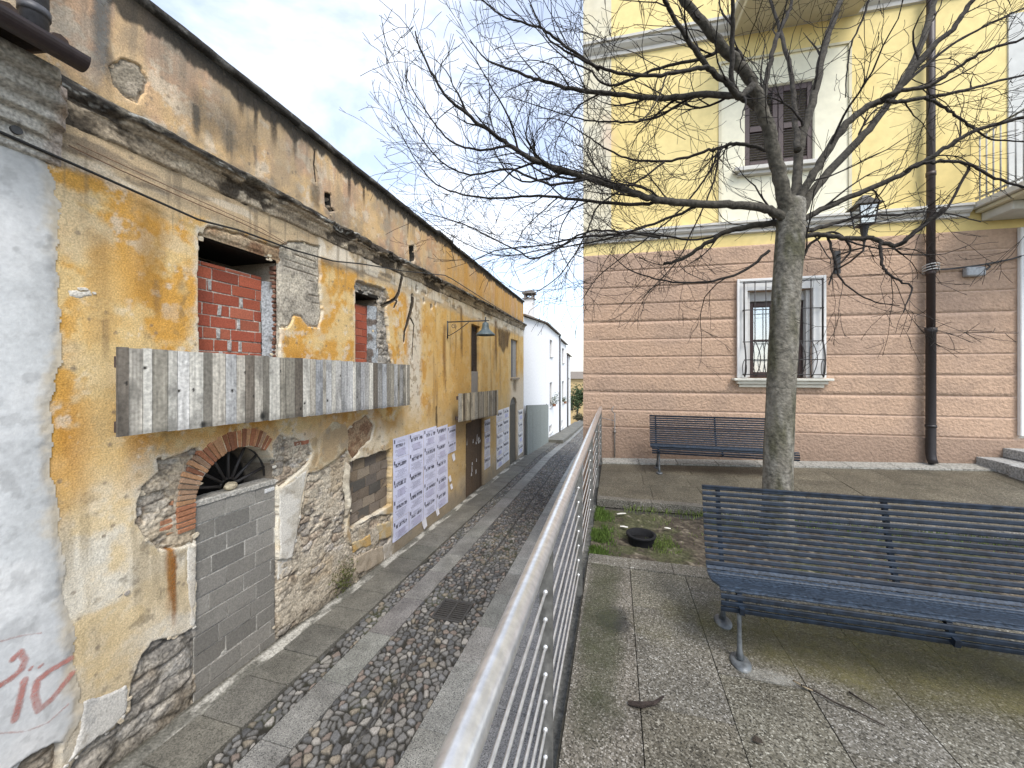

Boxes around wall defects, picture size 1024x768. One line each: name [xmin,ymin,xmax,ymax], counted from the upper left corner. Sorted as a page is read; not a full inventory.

flaking render [108,59,147,103]
damp [168,26,314,145]
flaking render [197,227,321,357]
flaking render [12,448,203,768]
rust [164,547,176,612]
flaking render [270,415,392,641]